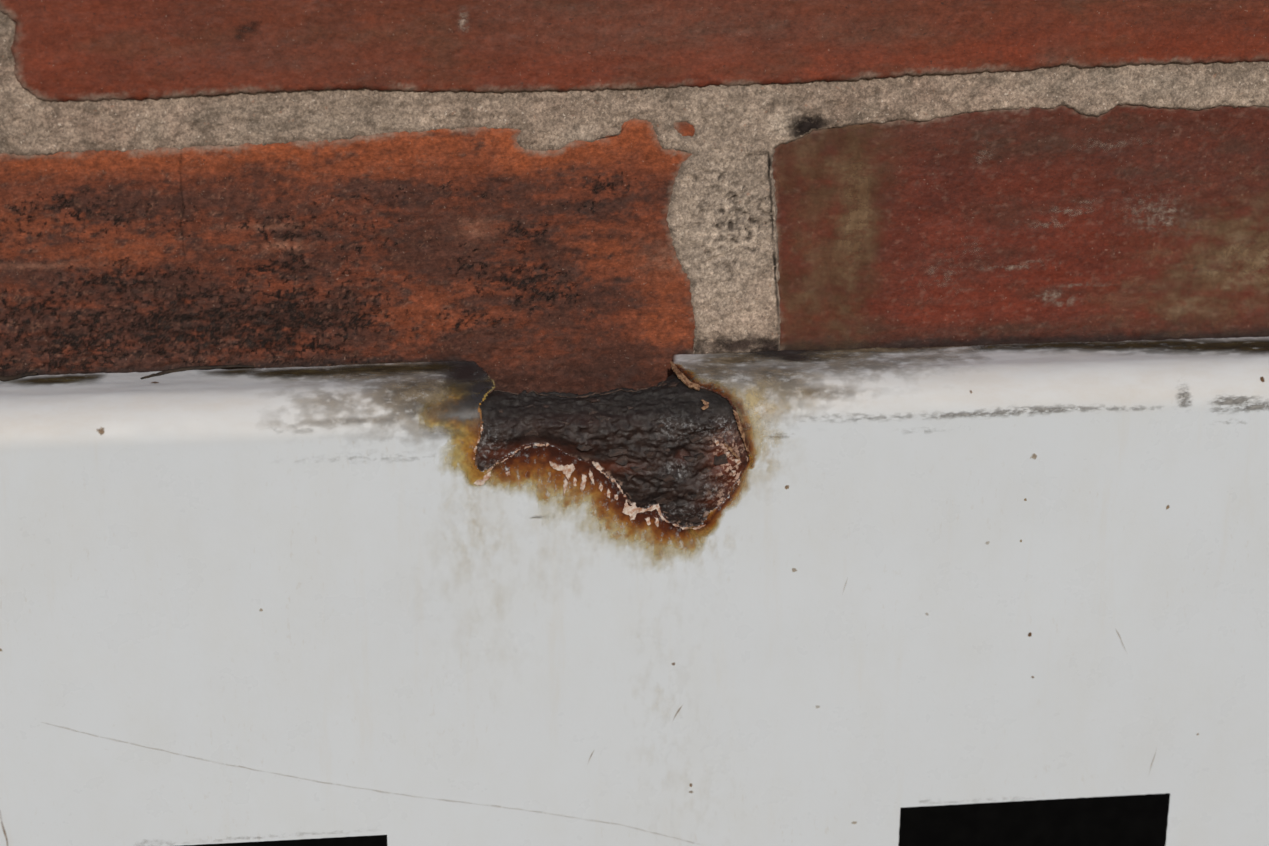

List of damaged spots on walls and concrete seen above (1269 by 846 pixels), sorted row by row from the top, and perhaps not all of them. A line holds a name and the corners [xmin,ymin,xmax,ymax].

corrosion [420,361,765,558]